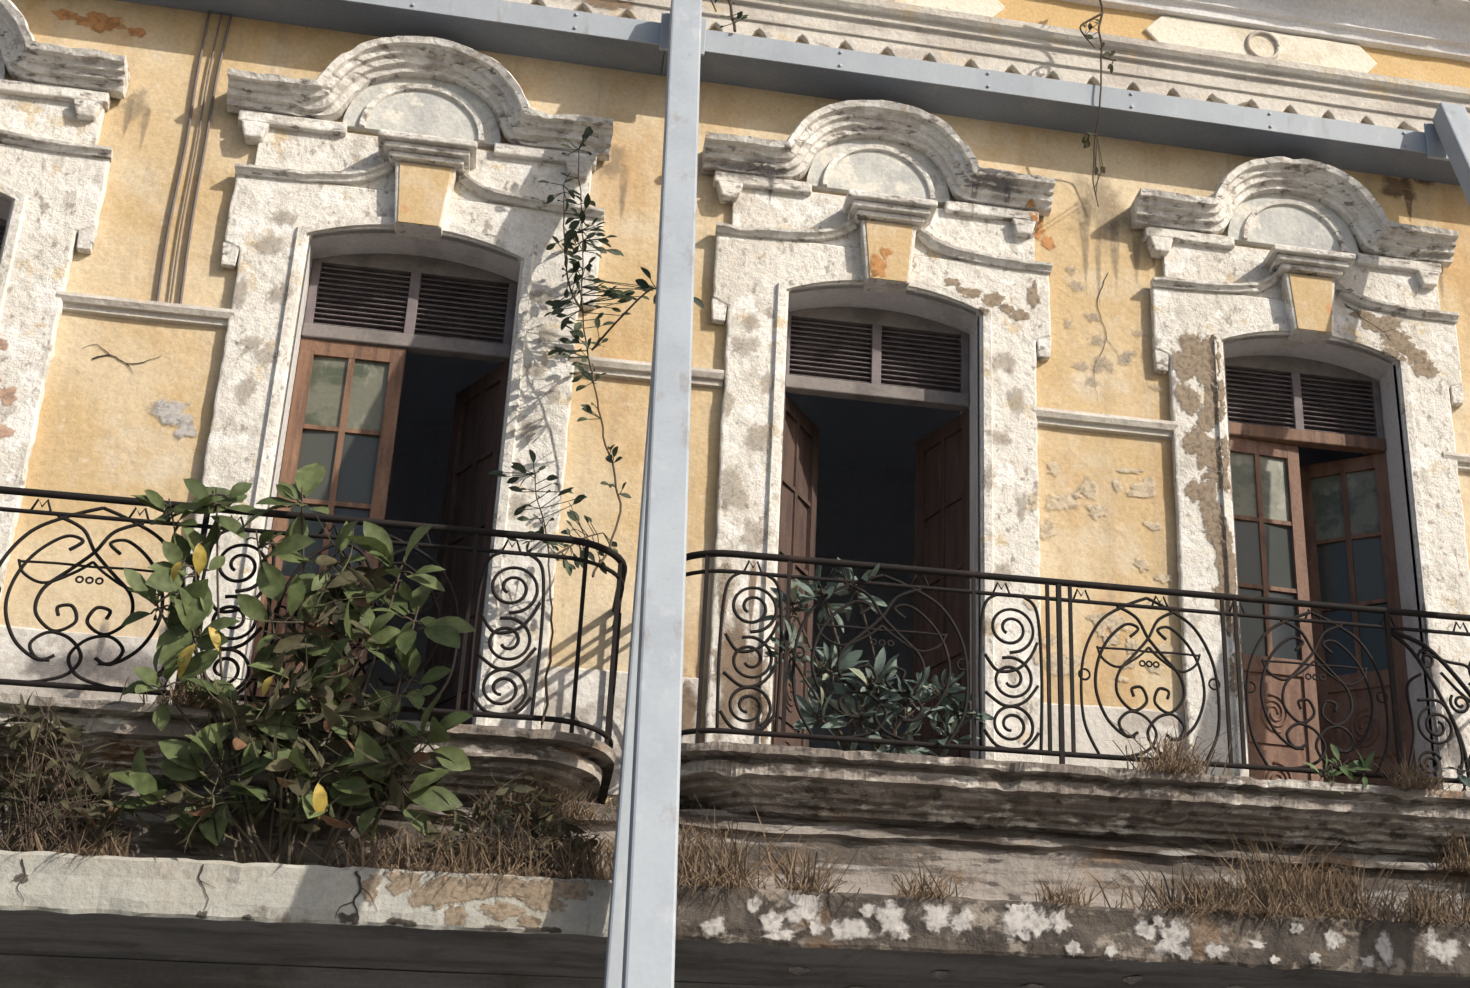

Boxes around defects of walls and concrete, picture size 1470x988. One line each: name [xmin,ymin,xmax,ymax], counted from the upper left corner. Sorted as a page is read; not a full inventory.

crack [82,344,160,373]
peeling [1349,309,1440,379]
peeling [1171,329,1245,706]
peeling [1033,634,1086,676]
peeling [1087,612,1177,682]
crack [198,864,215,912]
crack [334,871,377,925]
peeling [338,871,594,933]
peeling [1003,903,1083,957]
peeling [1134,916,1229,960]
peeling [1309,929,1346,964]
peeling [1424,926,1470,965]